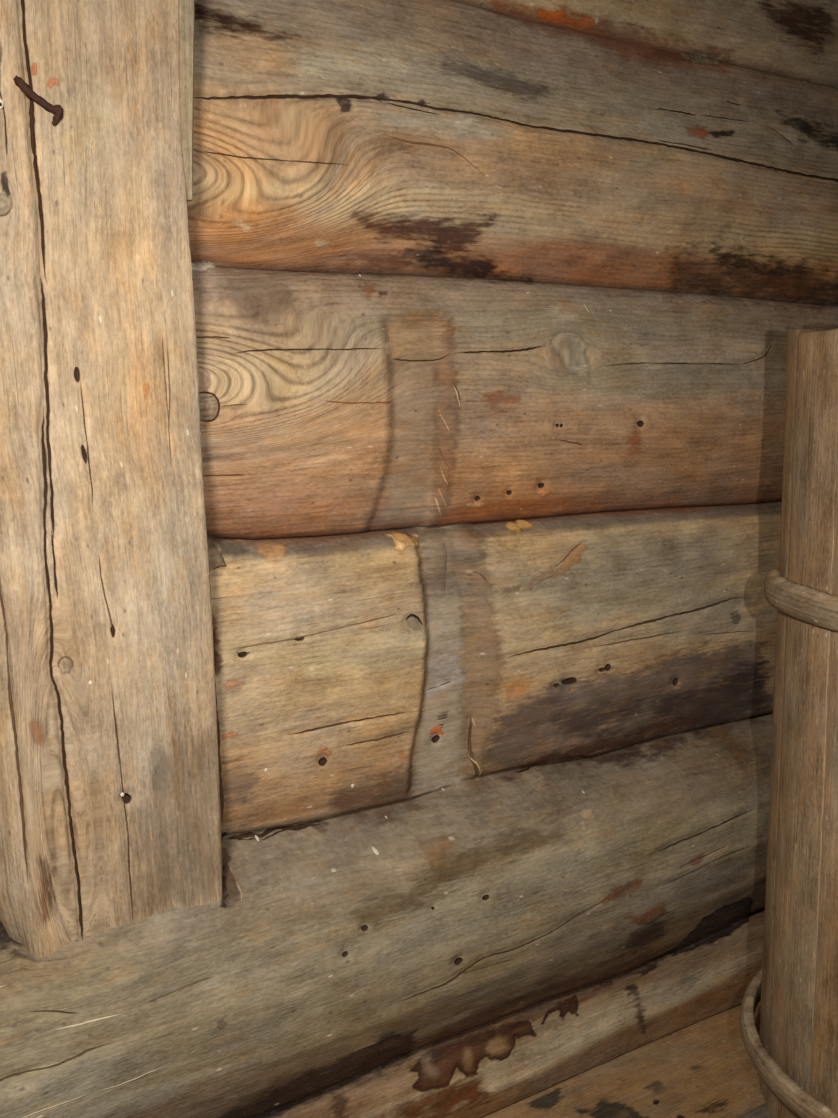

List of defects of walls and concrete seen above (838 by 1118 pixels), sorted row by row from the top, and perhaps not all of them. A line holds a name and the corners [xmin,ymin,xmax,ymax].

water stain [763,1,832,54]
crack [195,94,838,182]
water stain [351,211,532,281]
water stain [671,254,838,308]
crack [0,0,83,940]
crack [80,380,93,507]
crack [502,597,754,659]
water stain [220,897,753,1118]